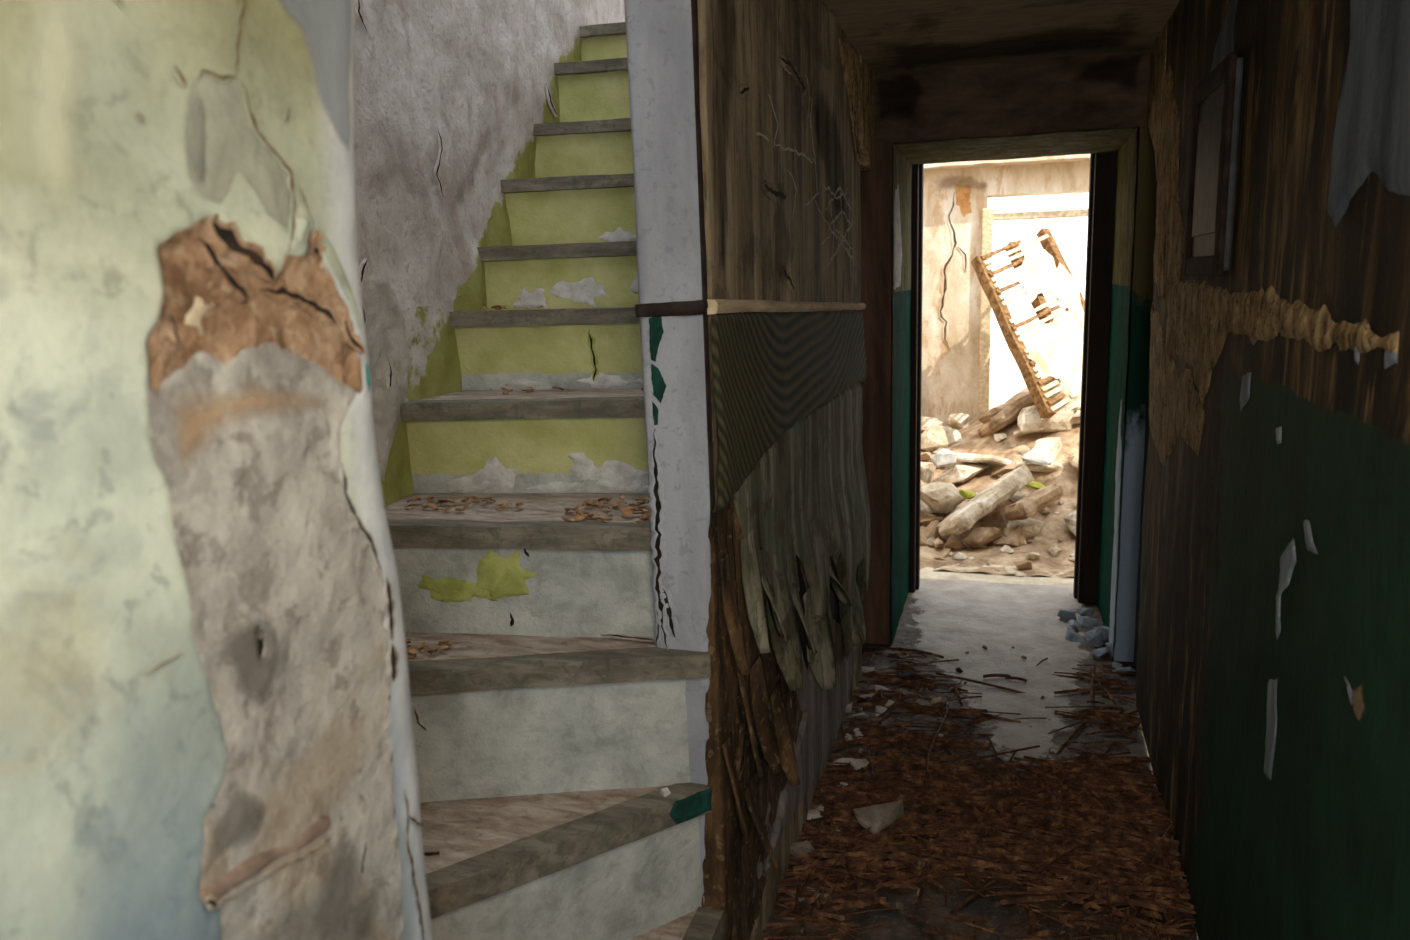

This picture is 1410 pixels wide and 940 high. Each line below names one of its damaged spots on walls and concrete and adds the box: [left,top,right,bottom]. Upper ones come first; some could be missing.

crack [173,0,314,253]
peeling [1327,0,1410,228]
crack [359,258,368,325]
flaking render [1149,64,1399,467]
crack [385,360,393,389]
peeling [577,316,666,425]
flaking render [147,75,411,940]
peeling [446,452,649,493]
peeling [418,548,537,603]
peeling [659,311,924,940]
peeling [1275,520,1318,639]
peeling [1264,678,1278,780]